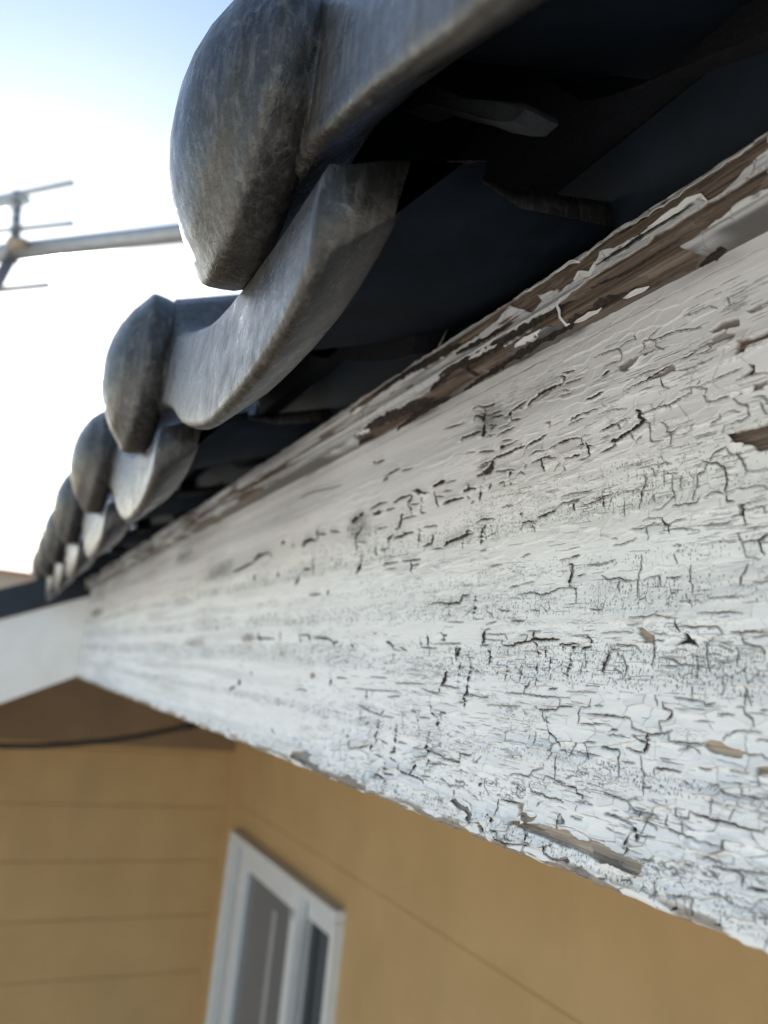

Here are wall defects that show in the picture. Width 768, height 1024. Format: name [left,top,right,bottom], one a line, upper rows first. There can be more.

crack [233,199,768,912]
peeling [350,134,768,446]
peeling [721,426,768,451]
peeling [517,801,642,878]